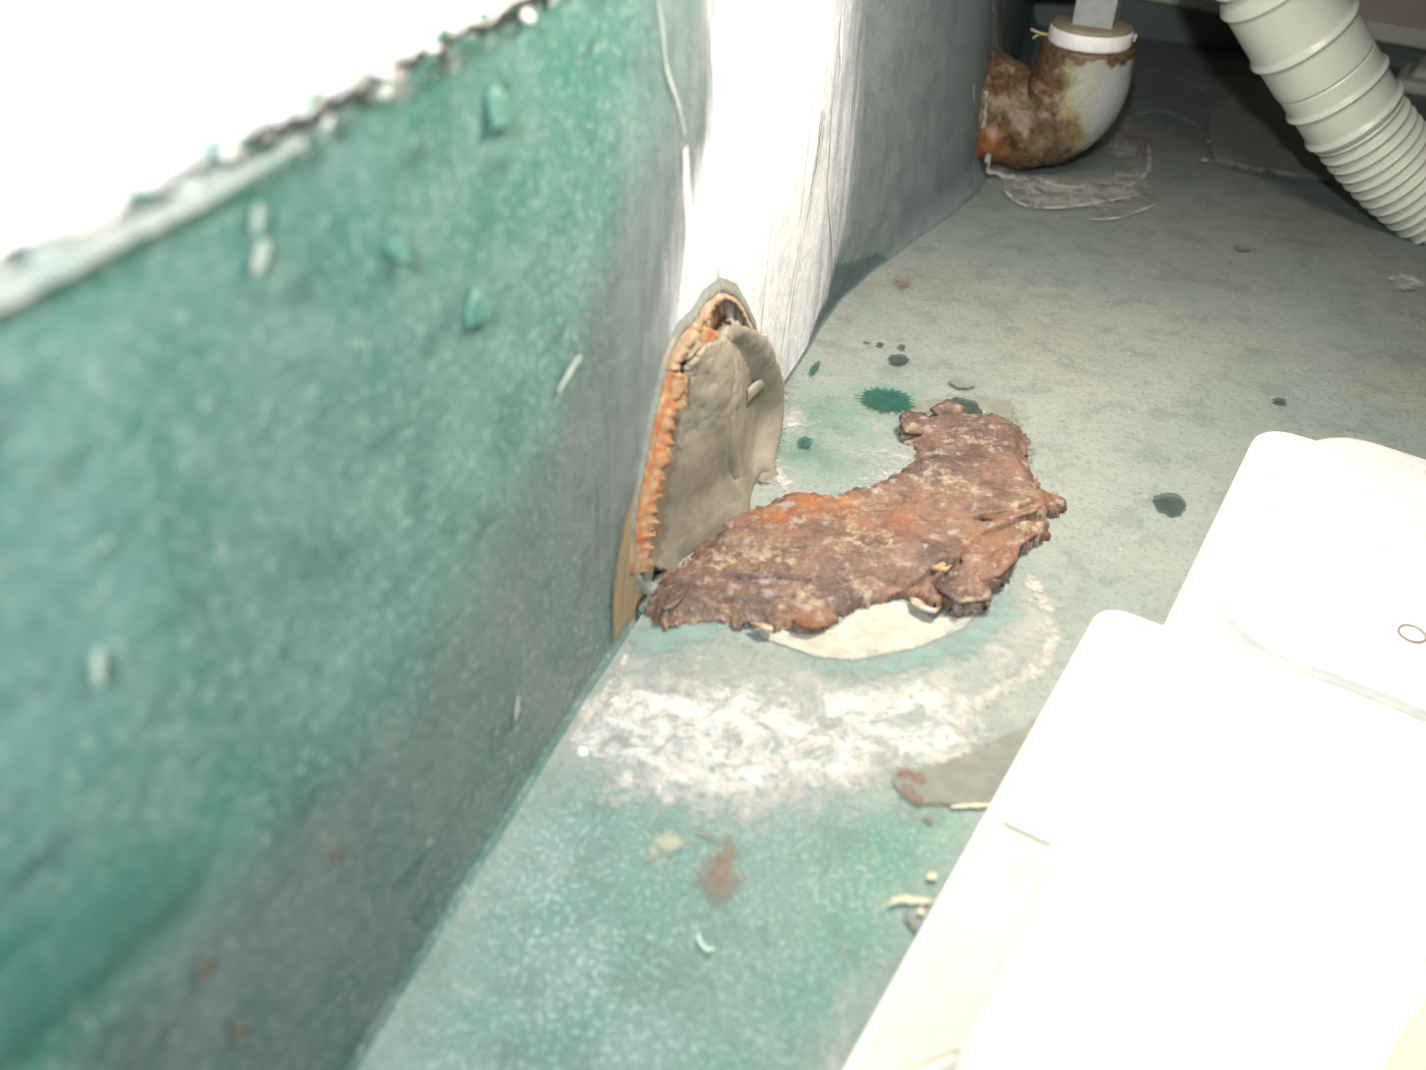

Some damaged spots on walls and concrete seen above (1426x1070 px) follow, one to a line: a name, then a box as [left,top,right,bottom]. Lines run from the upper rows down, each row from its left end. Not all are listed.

spalling [629,292,754,574]
rust [613,399,1067,640]
water stain [571,577,1060,816]